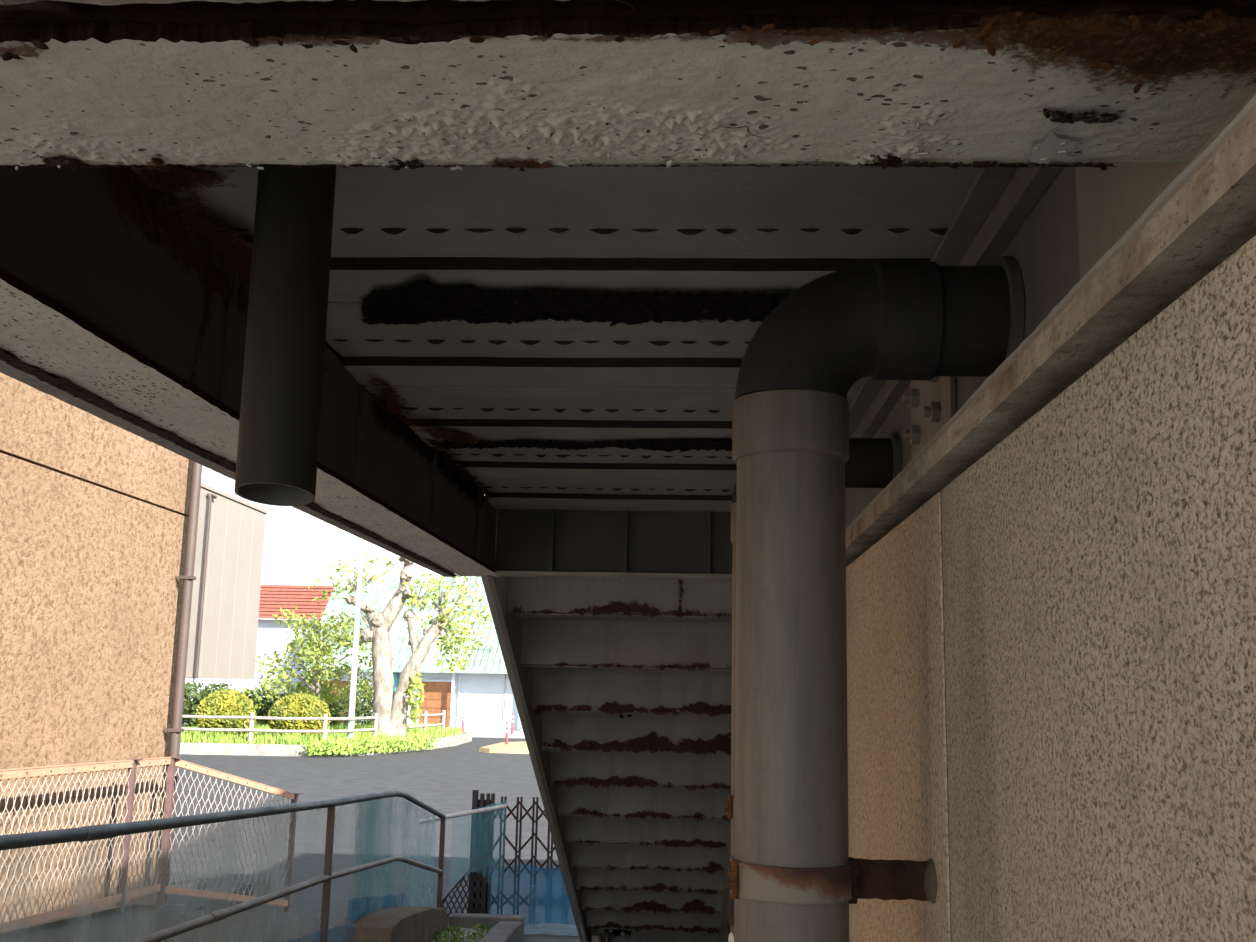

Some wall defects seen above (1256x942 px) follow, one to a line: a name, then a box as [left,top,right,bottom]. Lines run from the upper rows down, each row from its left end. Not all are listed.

rust [0,0,1256,97]
rust [0,153,1114,385]
rust [0,350,236,473]
rust [369,376,732,510]
rust [304,502,461,577]
rust [513,579,732,618]
rust [554,662,709,671]
rust [534,701,732,719]
rust [543,731,731,756]
rust [554,775,731,791]
rust [559,807,730,823]
rust [574,838,726,934]